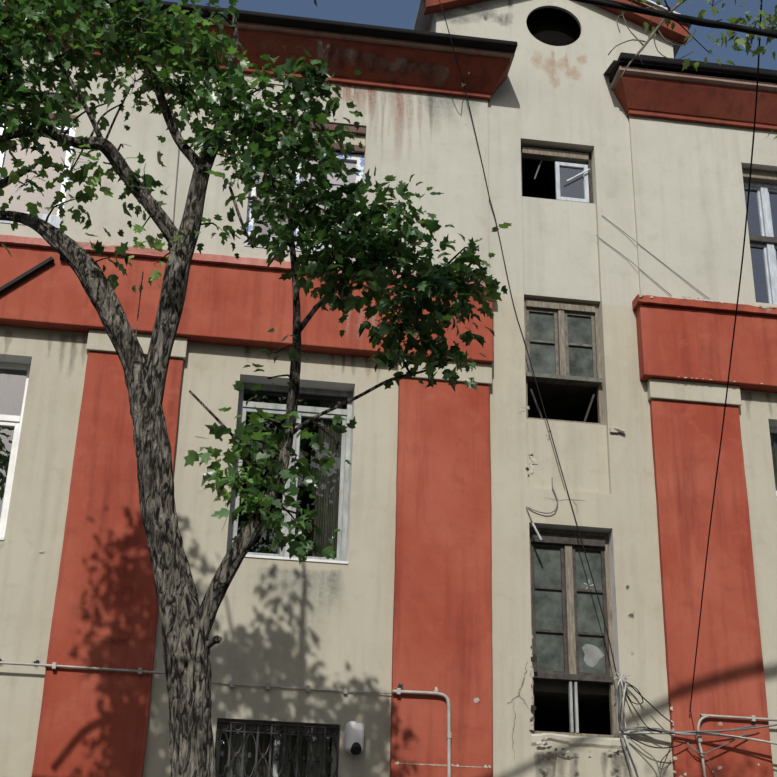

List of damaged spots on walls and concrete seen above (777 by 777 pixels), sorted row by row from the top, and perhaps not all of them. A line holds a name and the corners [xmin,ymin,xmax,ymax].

crack [507,662,528,759]